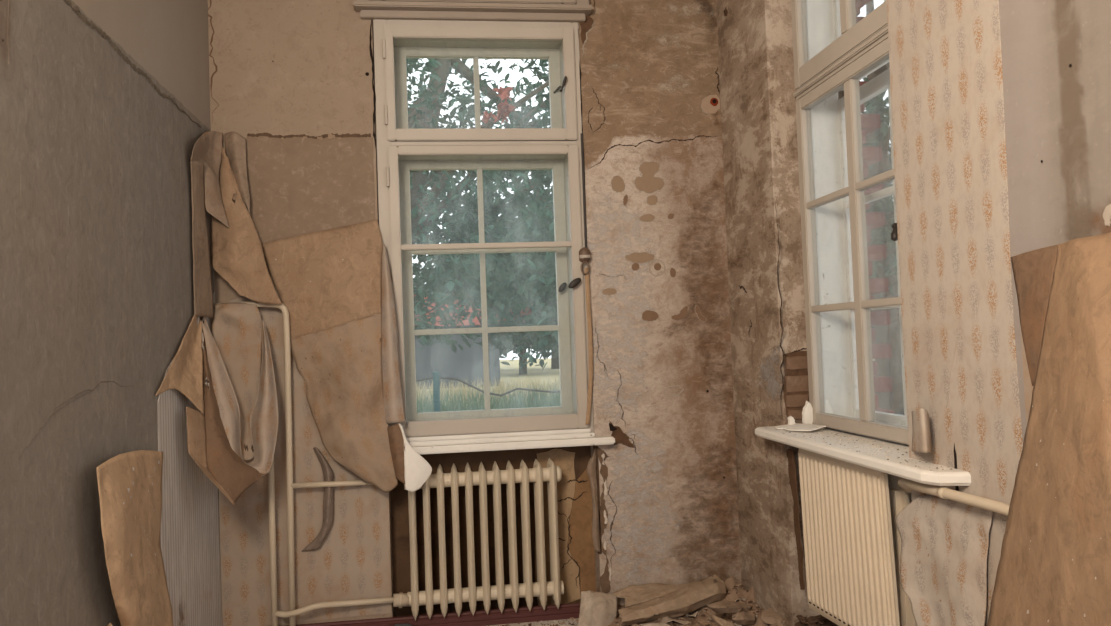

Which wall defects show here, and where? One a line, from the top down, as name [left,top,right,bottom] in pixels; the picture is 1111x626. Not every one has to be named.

crack [208,0,219,123]
peeling [611,161,674,222]
peeling [625,252,655,271]
peeling [642,306,688,322]
flaking render [775,203,826,431]
peeling [534,421,634,606]
spalling [786,449,805,590]